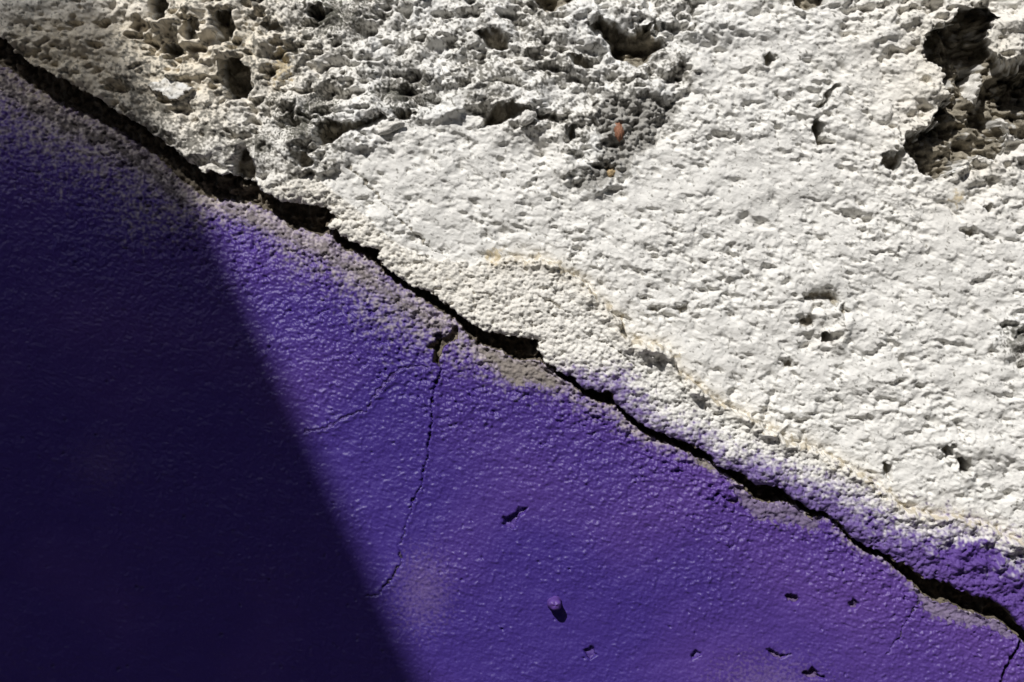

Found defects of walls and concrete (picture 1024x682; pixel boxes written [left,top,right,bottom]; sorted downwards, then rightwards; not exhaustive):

peeling [148,77,194,101]
spalling [903,3,1024,181]
peeling [0,77,185,210]
spalling [569,92,678,193]
crack [347,165,443,254]
crack [427,326,458,367]
crack [304,365,429,433]
crack [1000,645,1018,682]